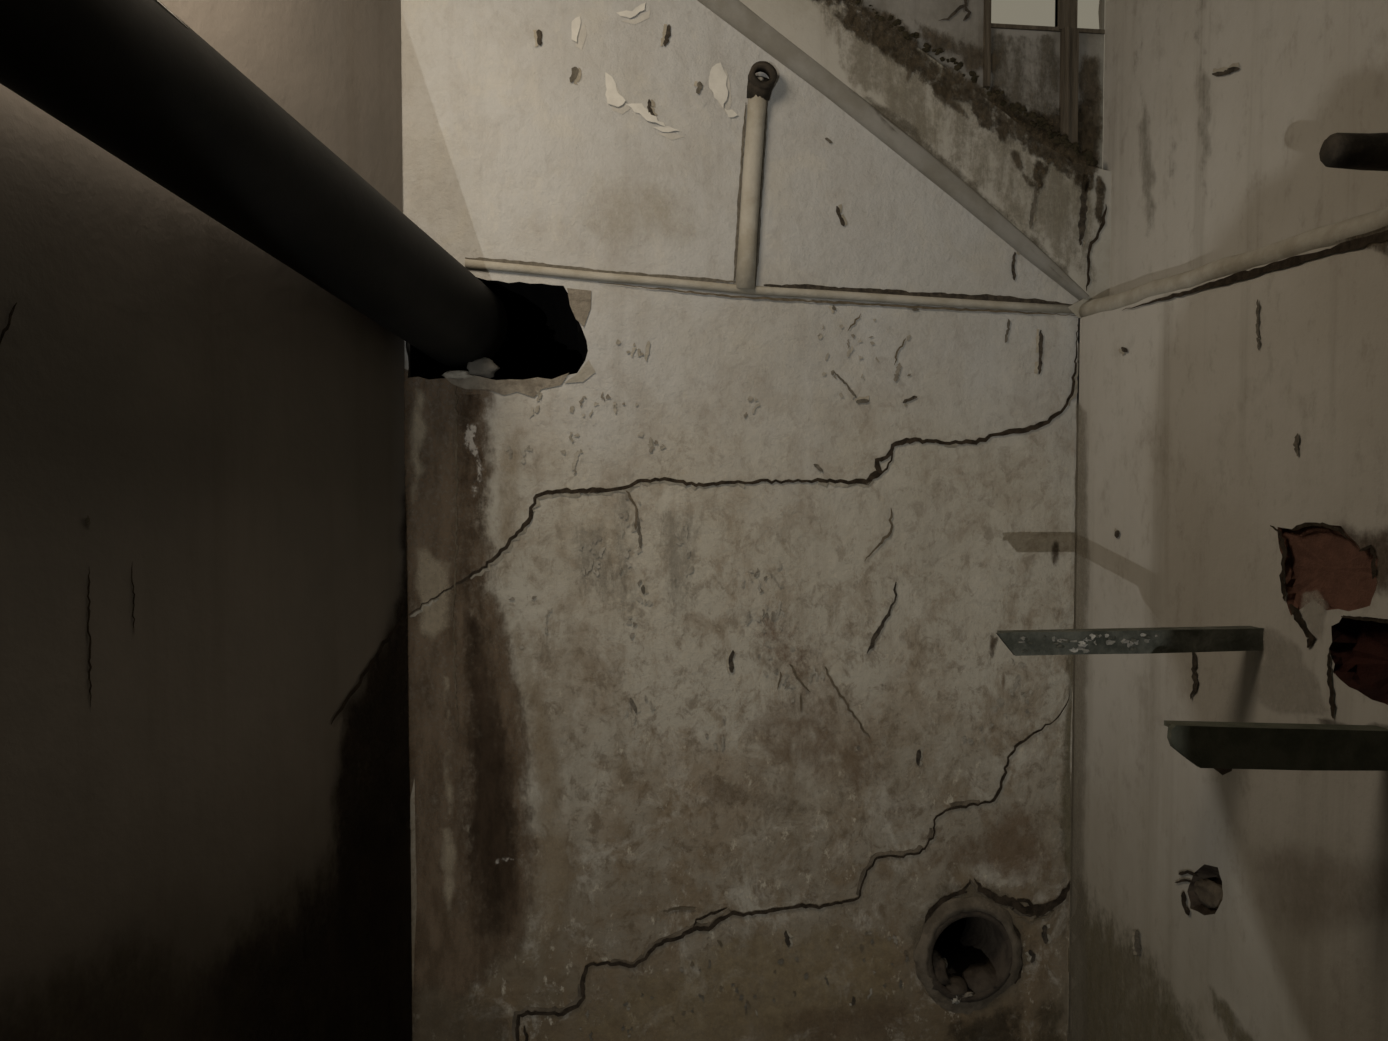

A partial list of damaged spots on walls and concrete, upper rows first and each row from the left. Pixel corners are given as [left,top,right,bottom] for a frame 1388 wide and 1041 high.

flaking render [533,29,542,47]
peeling [616,2,671,46]
peeling [605,72,684,140]
peeling [694,62,737,117]
leakage [816,0,1106,272]
spalling [406,277,595,397]
leakage [569,392,639,417]
crack [331,325,1079,724]
flaking render [1270,522,1388,718]
crack [777,664,870,738]
crack [512,694,1070,1041]
spalling [1175,864,1223,916]